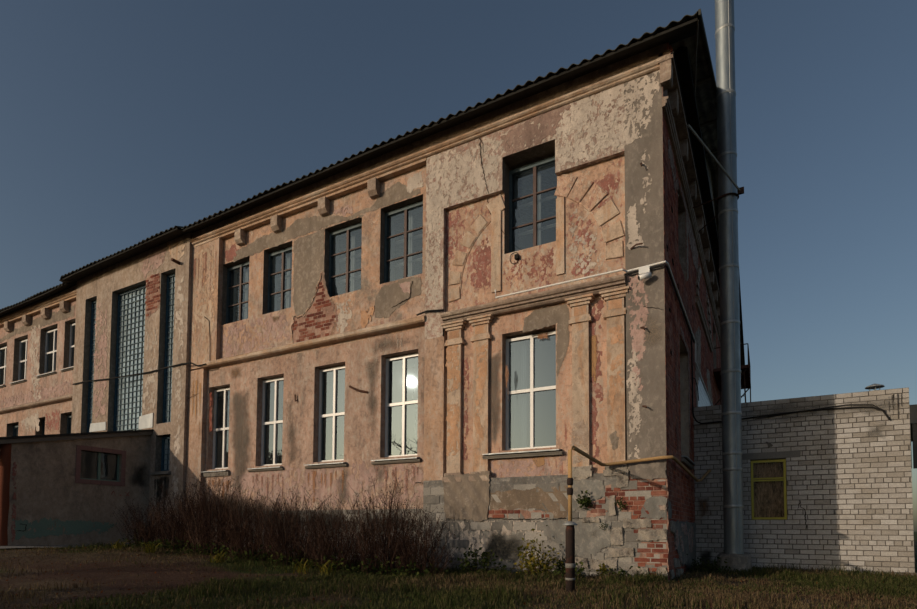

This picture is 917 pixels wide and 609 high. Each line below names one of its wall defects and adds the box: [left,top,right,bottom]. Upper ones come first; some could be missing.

peeling [407,70,660,308]
flaking render [141,237,375,497]
peeling [445,342,488,460]
spalling [447,486,568,562]
flaking render [490,275,669,576]